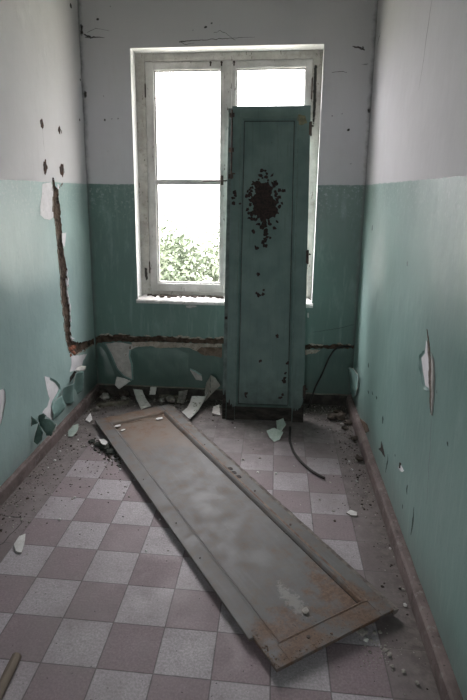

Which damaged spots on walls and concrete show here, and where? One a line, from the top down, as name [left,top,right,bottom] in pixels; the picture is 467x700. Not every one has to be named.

peeling [40,182,63,220]
peeling [105,342,139,389]
peeling [31,354,87,445]